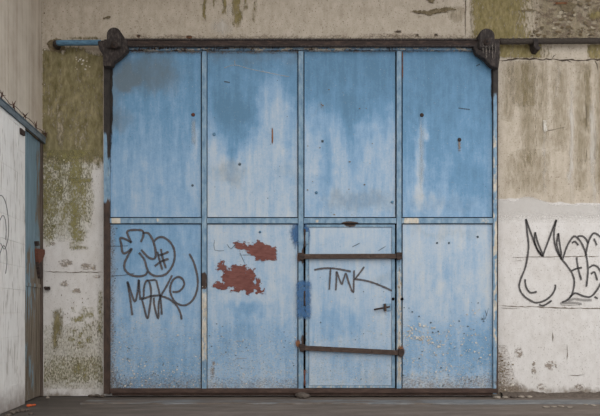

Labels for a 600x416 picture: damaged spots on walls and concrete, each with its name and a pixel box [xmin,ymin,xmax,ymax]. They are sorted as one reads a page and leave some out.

water stain [222,0,255,25]
crack [500,55,600,70]
water stain [43,152,93,243]
water stain [53,309,63,348]
peeling [397,311,520,394]